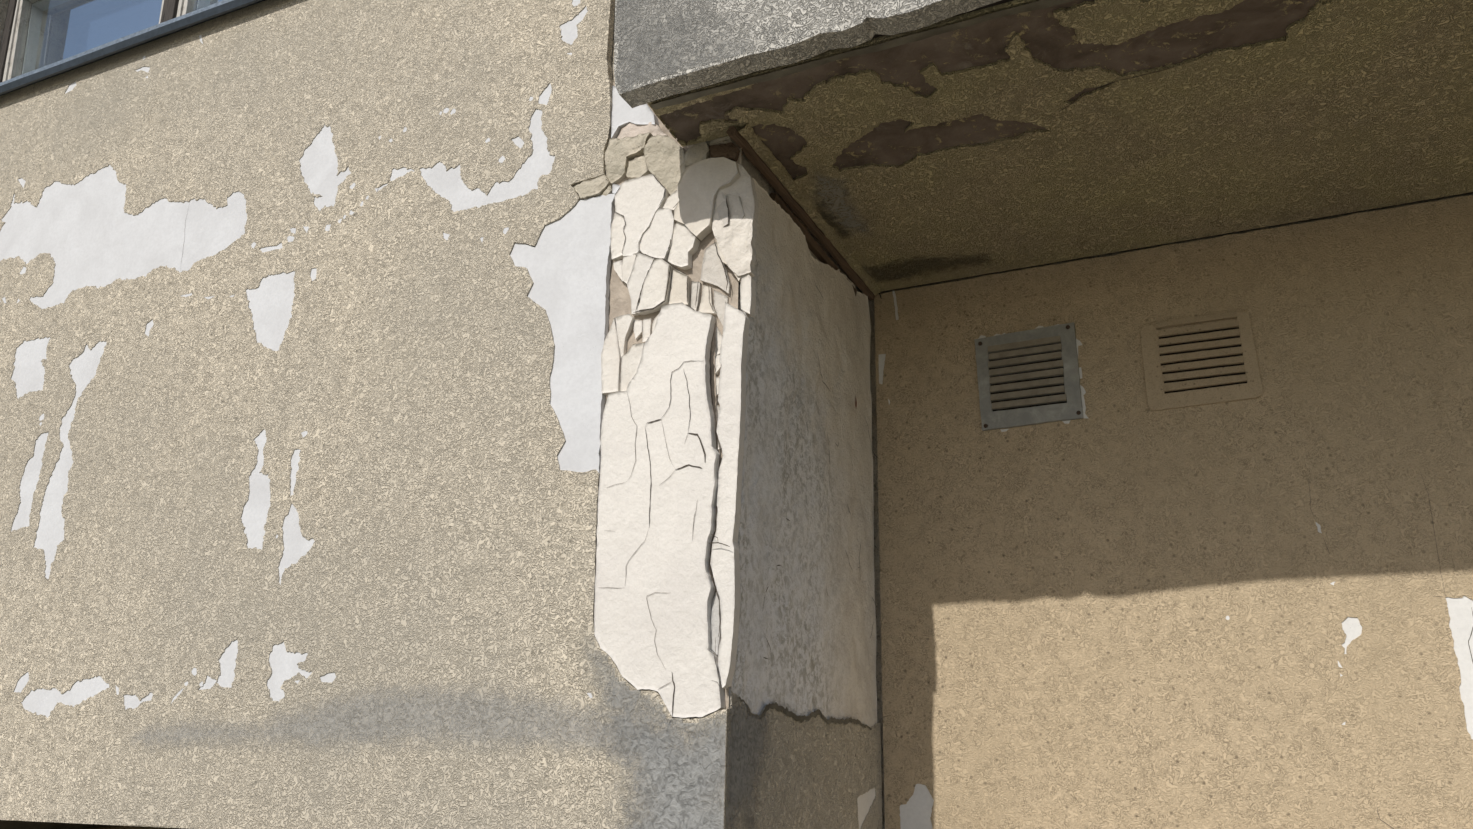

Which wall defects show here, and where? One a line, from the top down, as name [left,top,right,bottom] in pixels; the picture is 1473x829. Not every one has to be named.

peeling [0,84,555,309]
peeling [182,268,317,351]
spalling [503,0,1328,730]
peeling [11,337,107,579]
peeling [241,429,315,585]
crack [598,176,757,728]
peeling [14,672,153,718]
peeling [171,640,238,703]
peeling [267,642,336,701]
peeling [1445,596,1473,739]